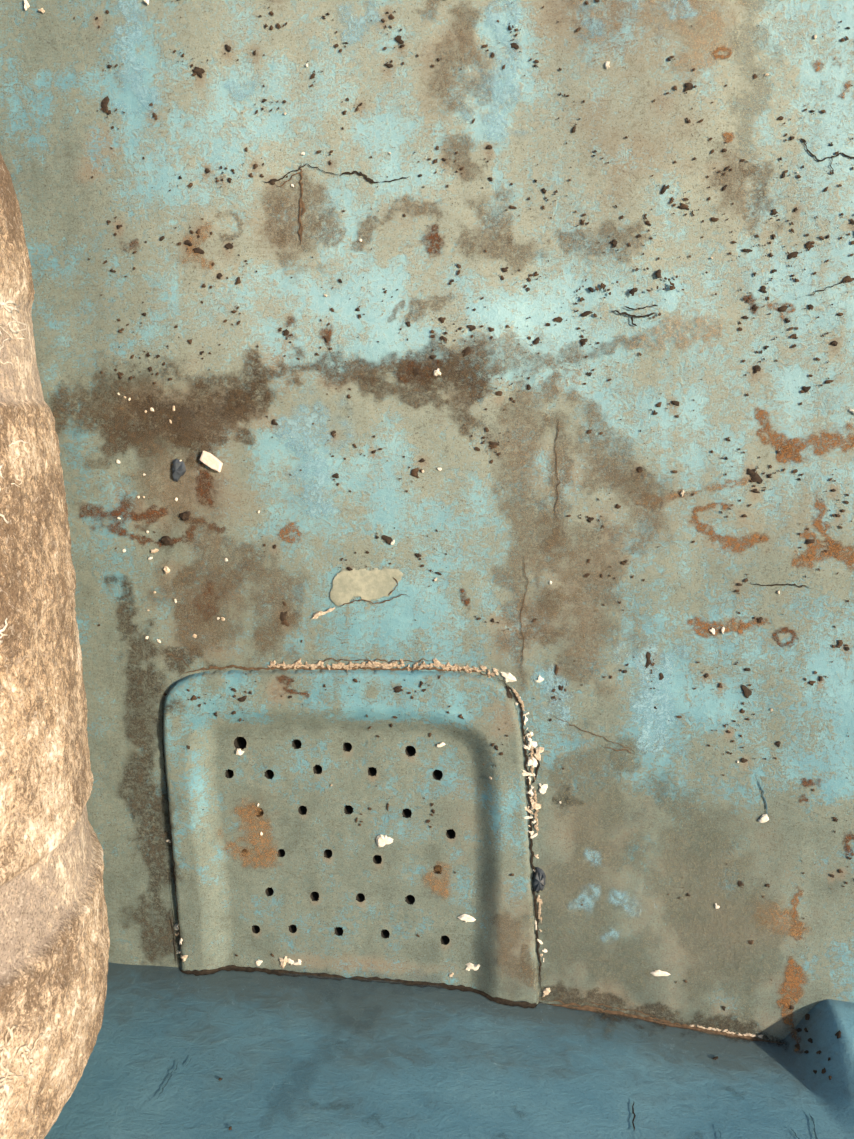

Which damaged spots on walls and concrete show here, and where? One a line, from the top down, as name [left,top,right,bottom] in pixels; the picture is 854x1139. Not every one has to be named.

crack [801,138,854,169]
crack [263,164,410,242]
crack [553,421,561,516]
rust [756,408,854,463]
rust [636,478,769,552]
rust [792,495,854,569]
peeling [312,567,411,619]
water stain [52,317,721,962]
rust [226,804,277,868]
crack [162,564,785,1044]
water stain [519,738,787,1050]
rust [777,957,806,1053]